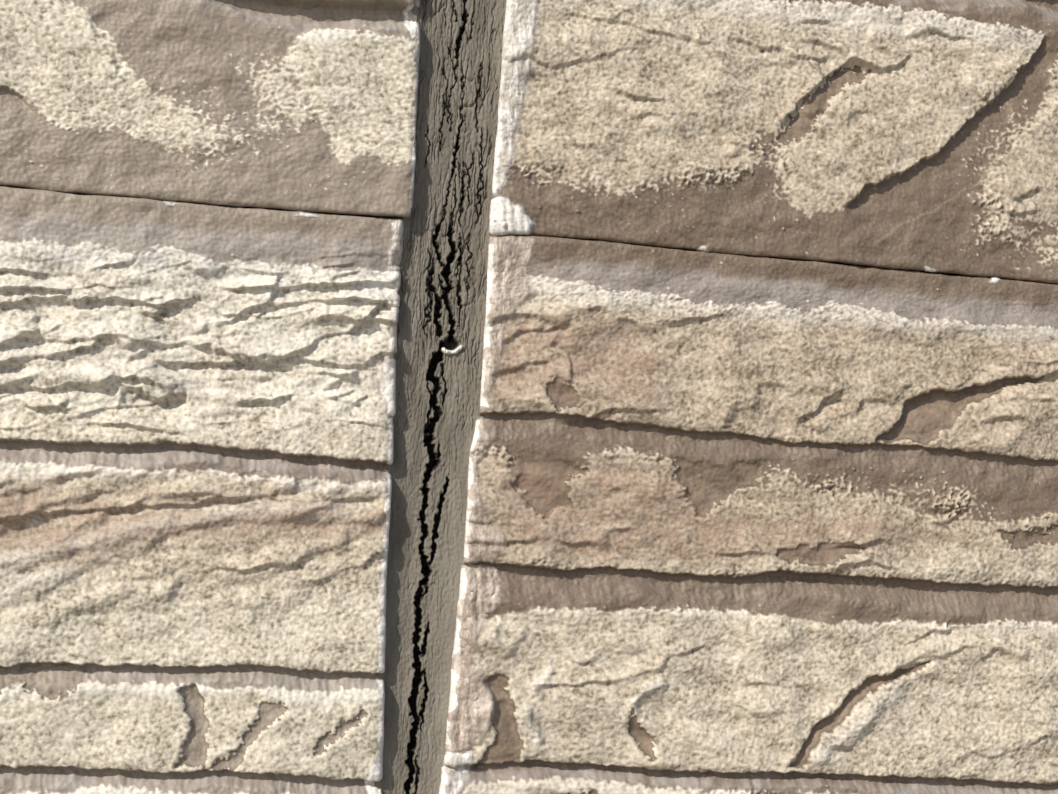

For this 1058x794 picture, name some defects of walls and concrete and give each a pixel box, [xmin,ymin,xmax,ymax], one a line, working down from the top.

crack [404,0,484,794]